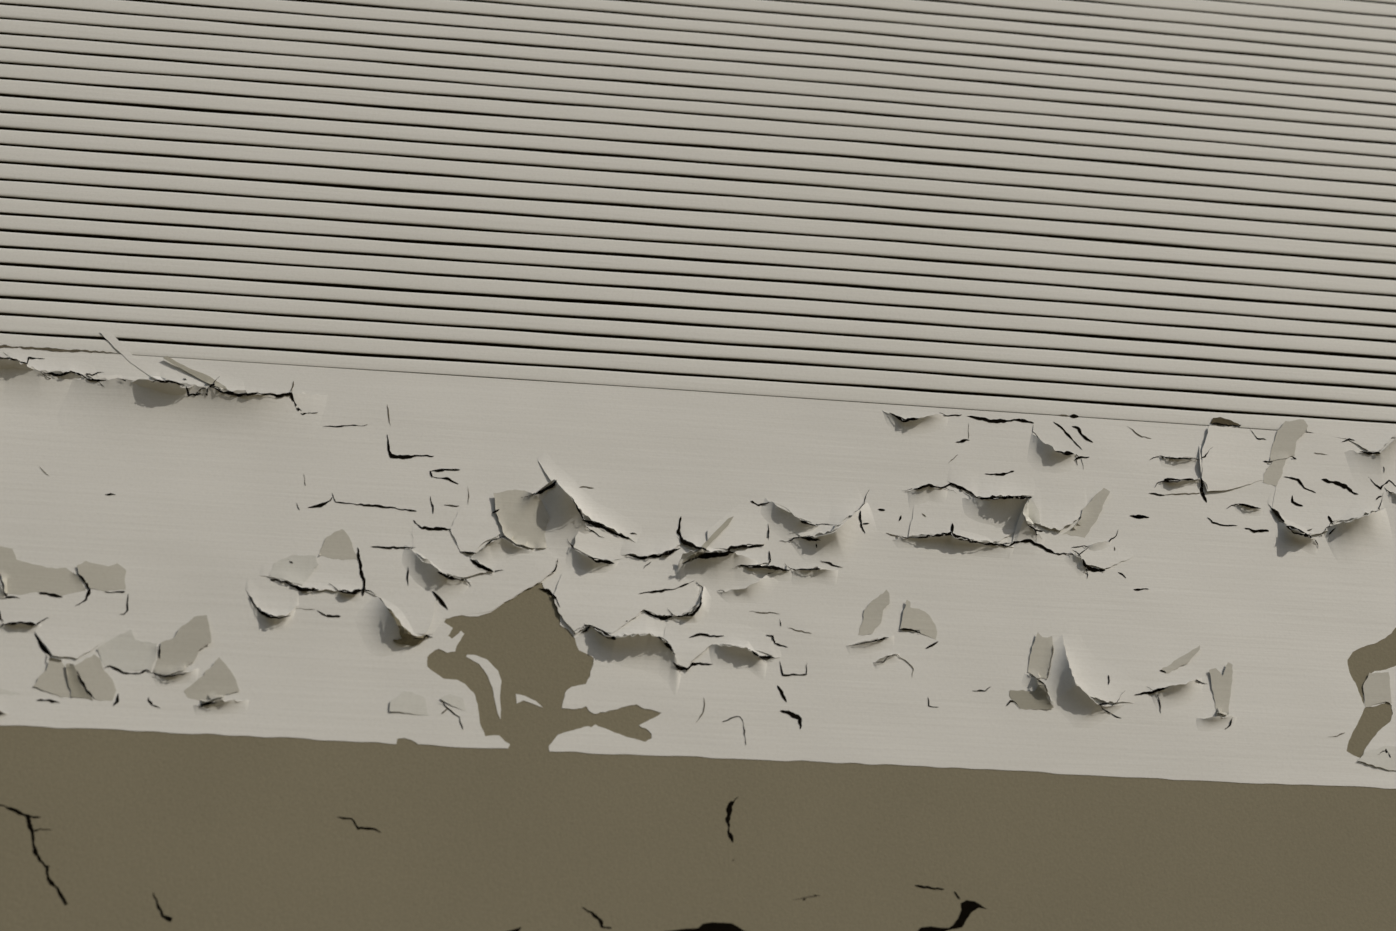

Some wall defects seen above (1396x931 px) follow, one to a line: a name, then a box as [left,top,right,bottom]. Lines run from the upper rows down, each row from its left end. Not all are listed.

crack [297,406,469,549]
peeling [893,433,1133,577]
crack [1054,414,1092,448]
crack [1285,438,1396,522]
peeling [0,546,126,606]
peeling [245,451,877,756]
peeling [0,615,249,715]
crack [766,618,807,729]
peeling [1006,626,1237,731]
peeling [1347,629,1396,758]
crack [672,922,744,931]
crack [914,885,986,931]